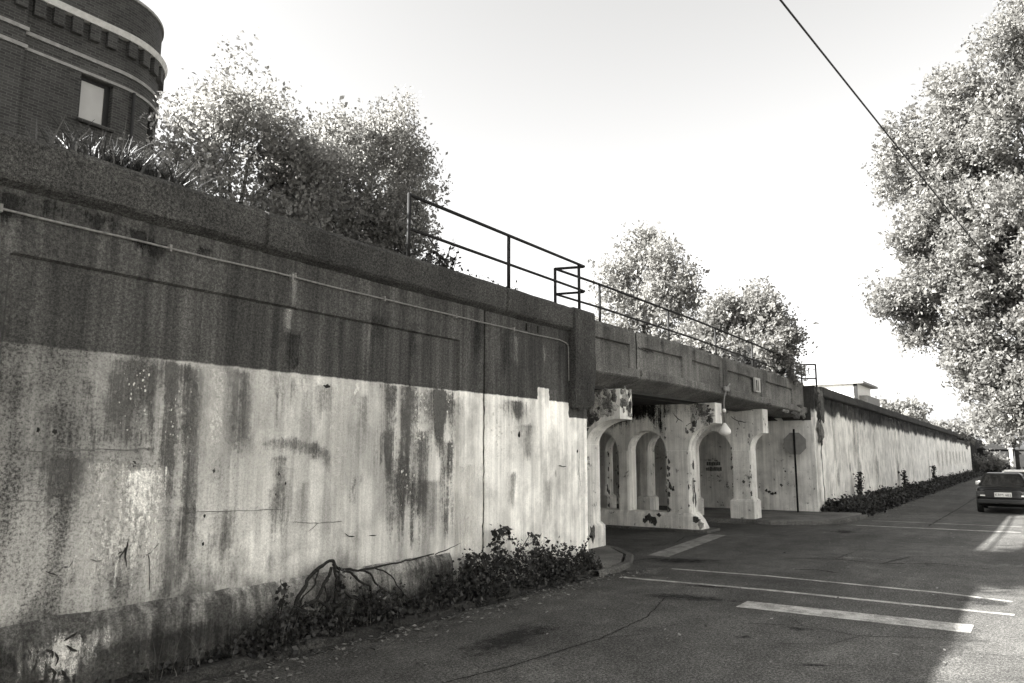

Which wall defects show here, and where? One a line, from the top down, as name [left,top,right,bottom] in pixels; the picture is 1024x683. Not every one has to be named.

leakage [503,400,531,454]
spalling [587,386,633,431]
spalling [685,403,715,434]
leakage [45,359,251,591]
leakage [380,385,455,543]
spalling [643,453,674,526]